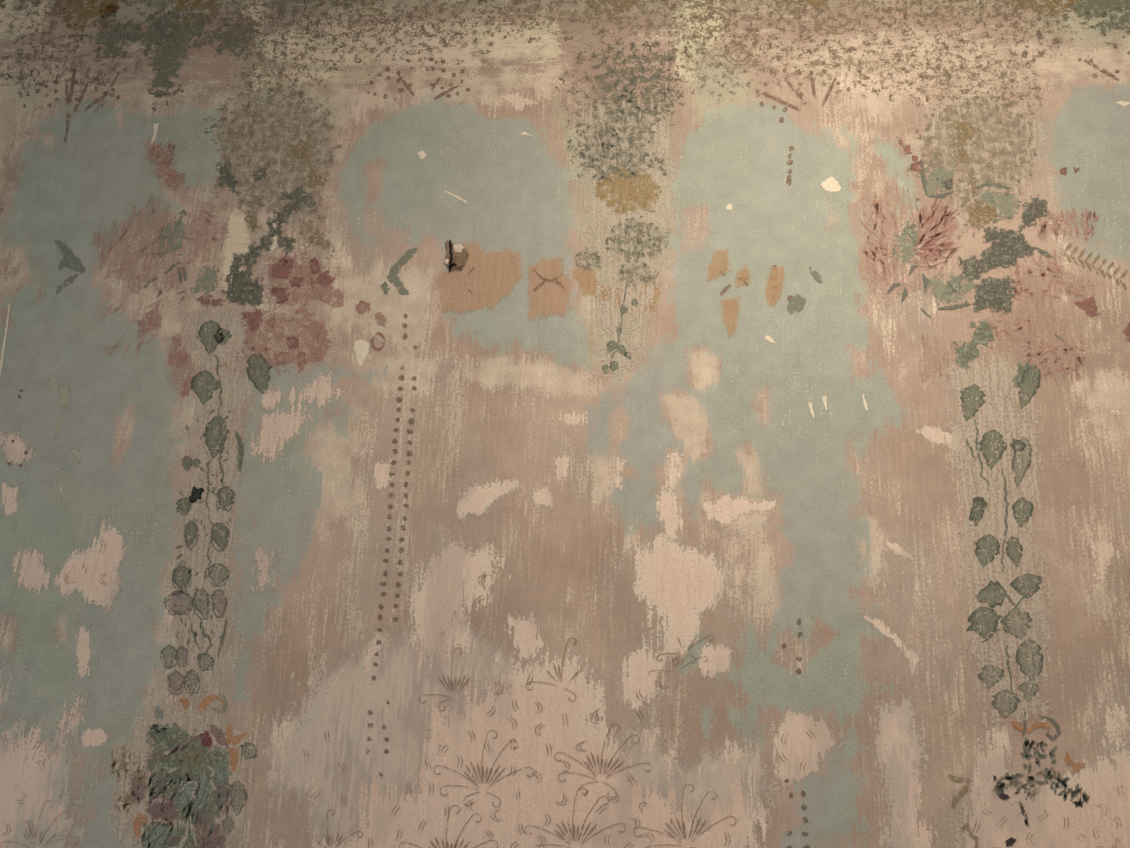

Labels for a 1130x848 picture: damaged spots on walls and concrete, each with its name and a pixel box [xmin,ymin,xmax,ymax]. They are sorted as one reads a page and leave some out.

spalling [445,239,468,271]
peeling [354,339,370,367]
peeling [0,430,37,468]
peeling [249,365,352,466]
peeling [556,410,588,428]
peeling [904,423,963,452]
peeling [0,481,19,517]
peeling [12,516,130,612]
peeling [1087,537,1122,584]
peeling [249,448,845,848]
peeling [0,625,108,848]
peeling [865,692,1130,848]